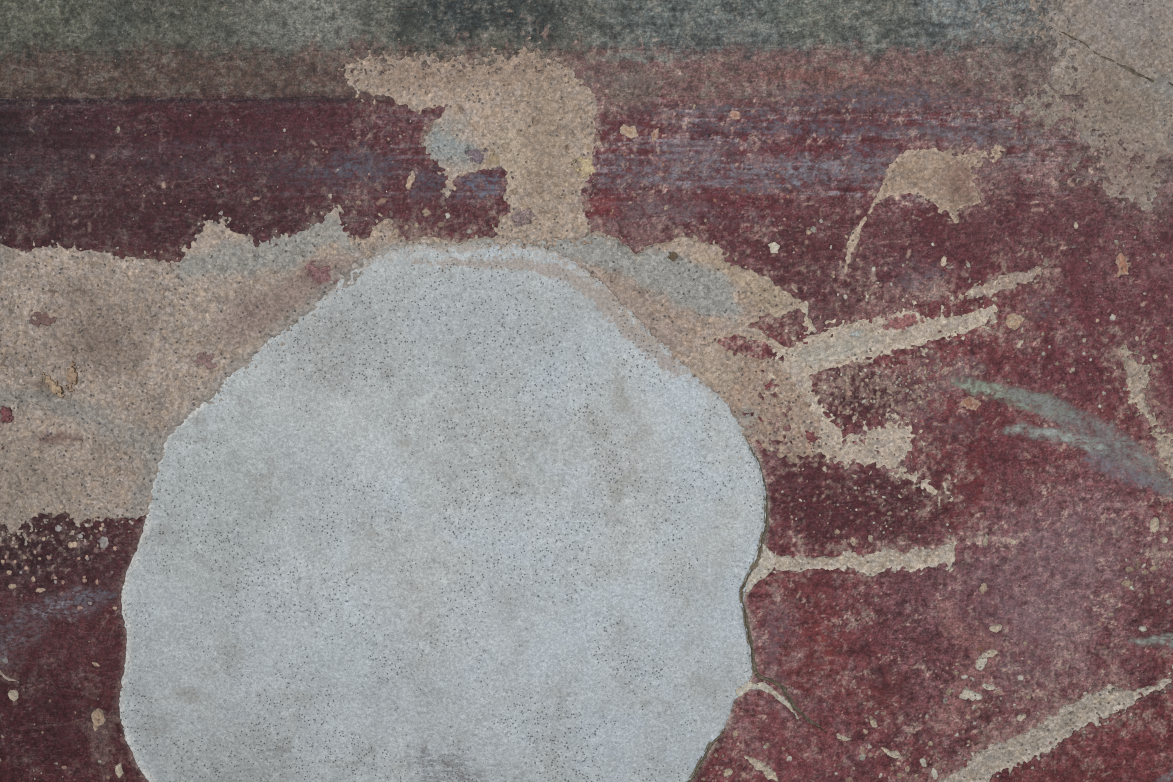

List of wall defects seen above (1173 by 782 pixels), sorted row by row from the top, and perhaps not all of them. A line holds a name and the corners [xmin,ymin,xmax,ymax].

crack [1059,31,1173,86]
spalling [0,0,1173,594]
crack [736,438,827,732]
spalling [834,641,1173,782]